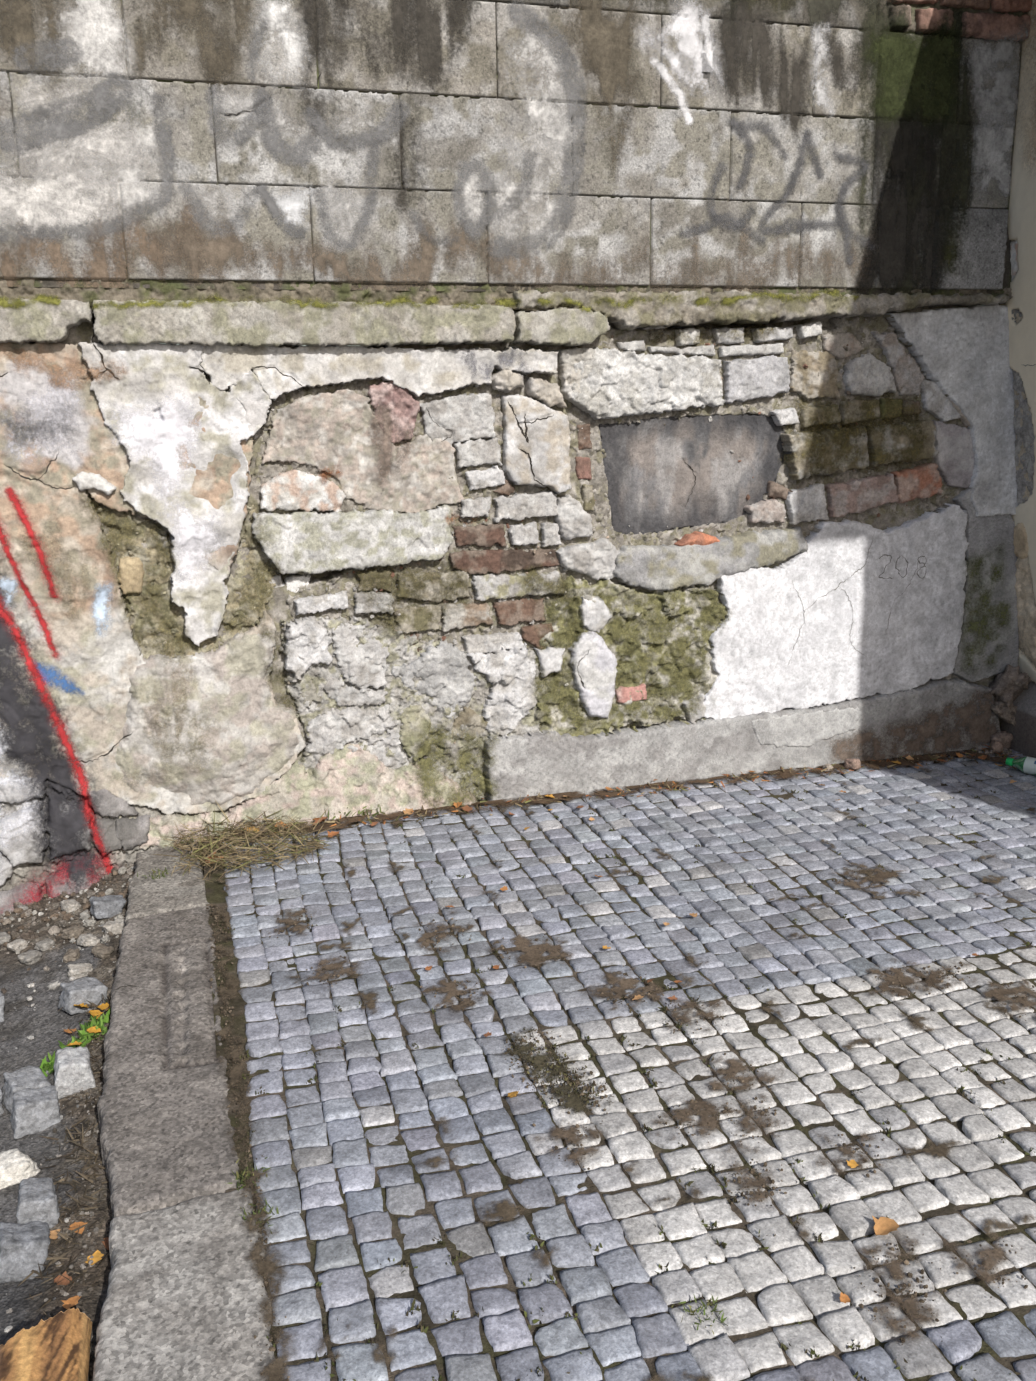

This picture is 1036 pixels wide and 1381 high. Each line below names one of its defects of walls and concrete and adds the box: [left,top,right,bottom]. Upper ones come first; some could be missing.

water stain [0,0,974,295]
crack [80,300,118,379]
flaking render [1012,370,1035,505]
flaking render [0,312,975,914]
flaking render [1013,523,1036,670]